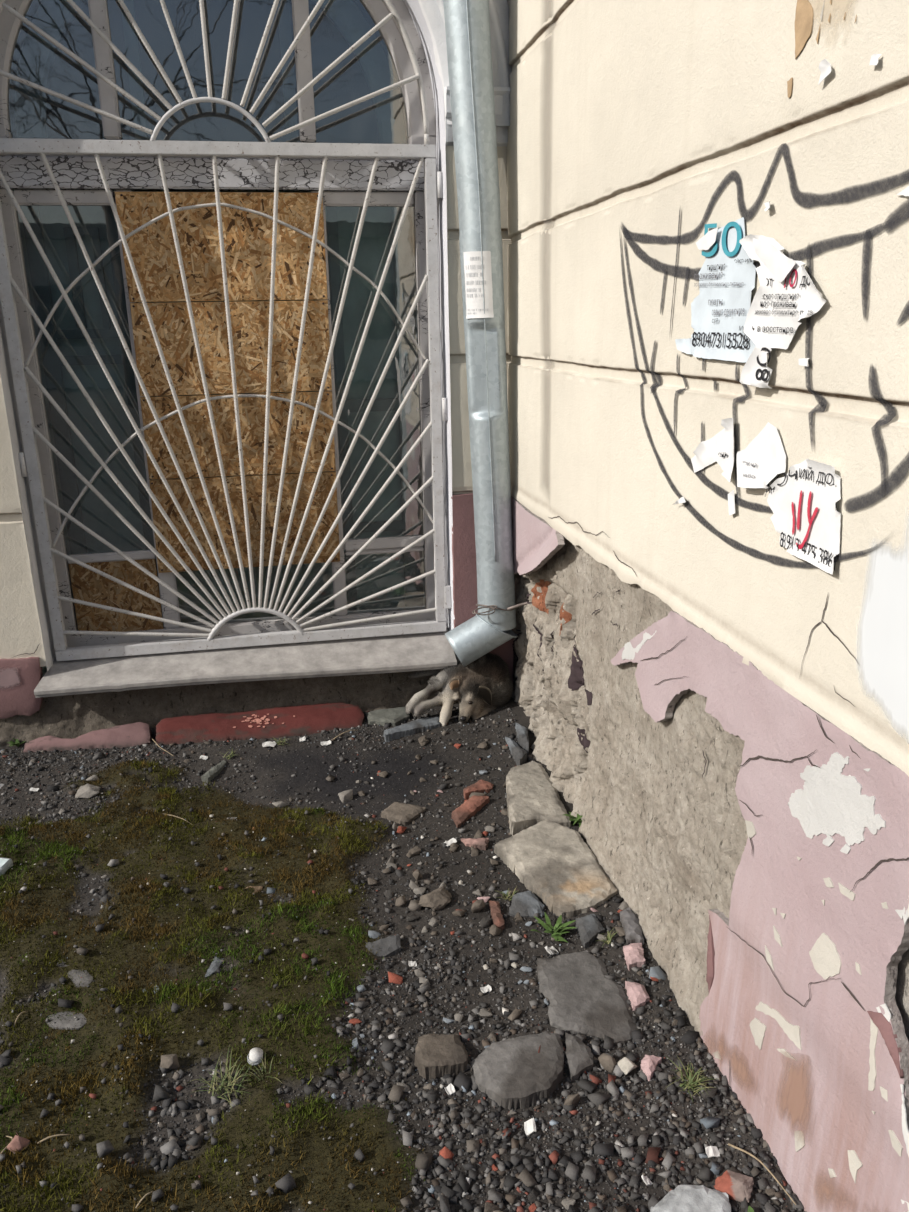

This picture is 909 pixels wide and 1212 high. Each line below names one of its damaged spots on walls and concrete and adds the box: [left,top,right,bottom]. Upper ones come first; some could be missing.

peeling [795,0,857,59]
crack [800,595,859,675]
crack [739,715,861,768]
flaking render [511,536,756,1036]
peeling [788,752,886,854]
peeling [765,908,786,971]
peeling [809,933,862,979]
peeling [822,877,856,905]
peeling [881,899,909,925]
peeling [750,1001,802,1061]
flaking render [867,948,909,1157]
peeling [828,1150,863,1183]